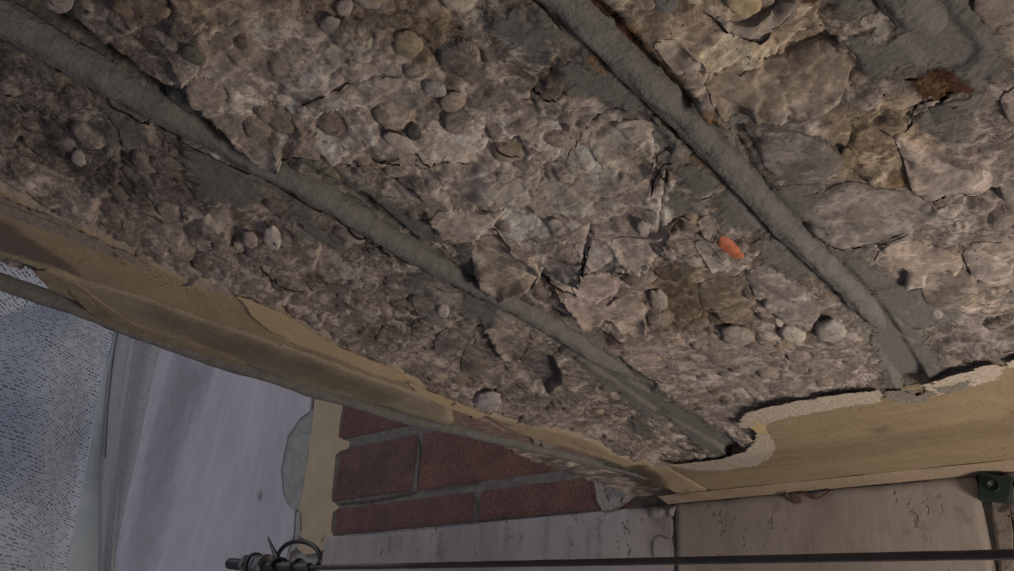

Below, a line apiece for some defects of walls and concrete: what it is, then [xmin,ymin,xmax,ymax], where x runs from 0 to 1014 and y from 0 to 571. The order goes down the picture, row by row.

crack [300,82,358,108]
rust [912,68,975,101]
crack [87,87,525,268]
spalling [14,0,938,471]
crack [479,208,591,324]
crack [667,215,717,243]
spalling [536,0,1014,396]